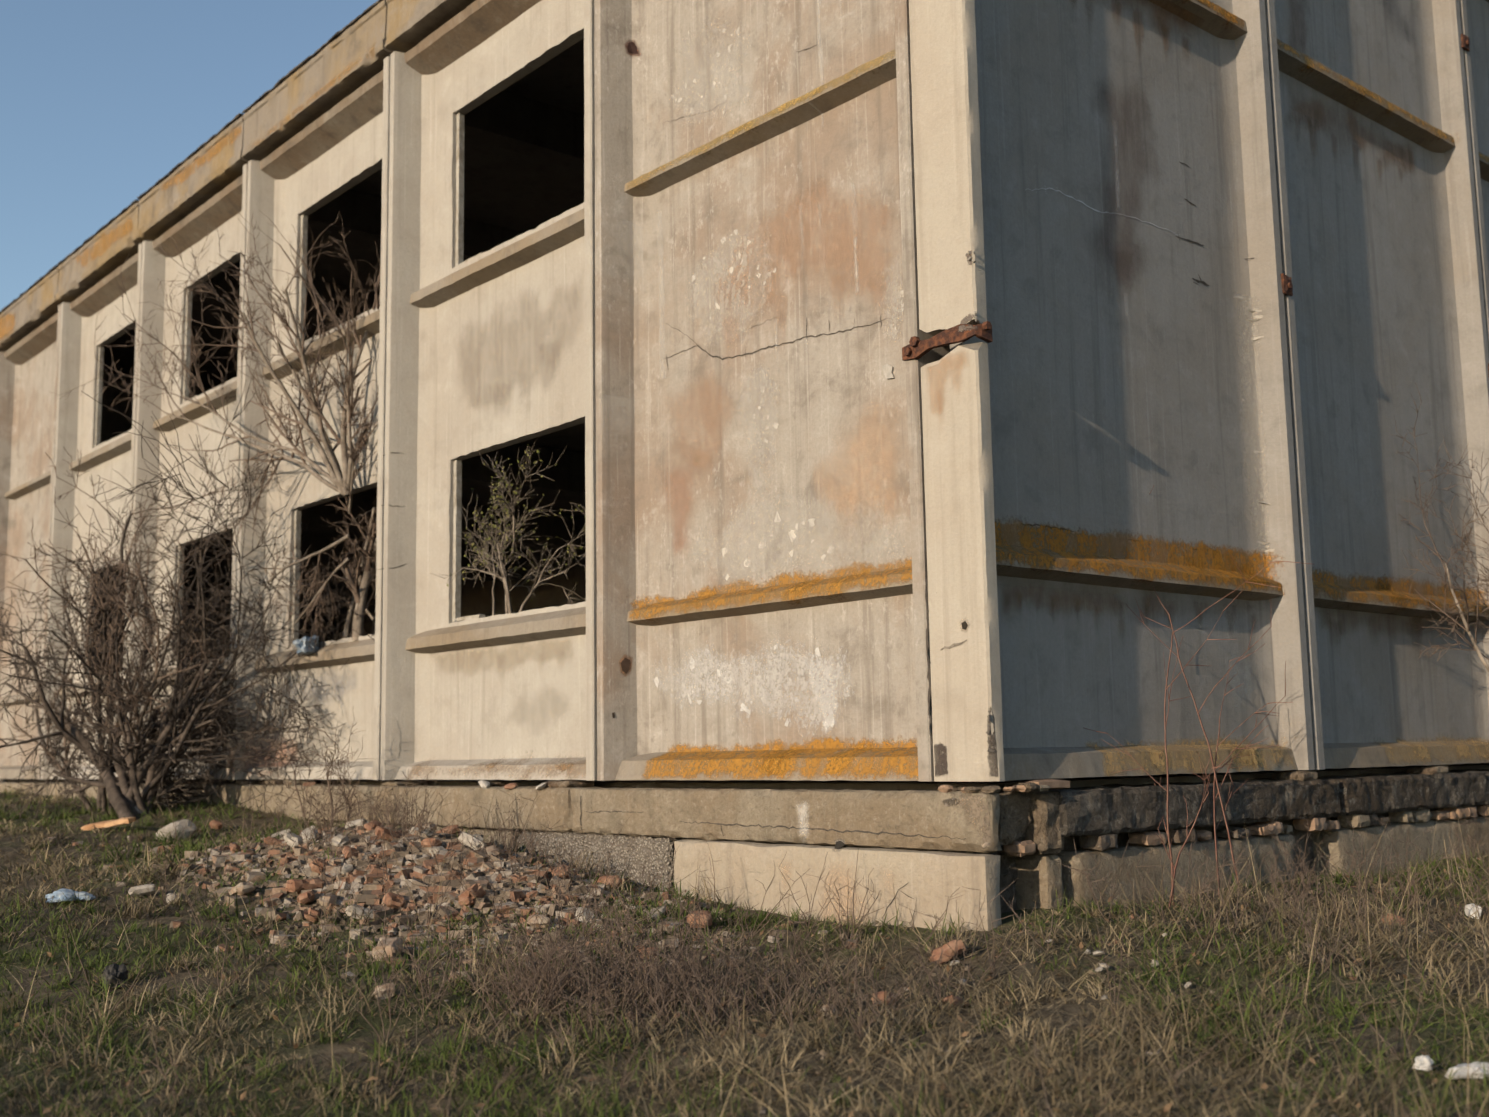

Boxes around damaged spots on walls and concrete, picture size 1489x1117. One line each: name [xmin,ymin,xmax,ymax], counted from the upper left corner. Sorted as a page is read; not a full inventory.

crack [660,315,899,367]